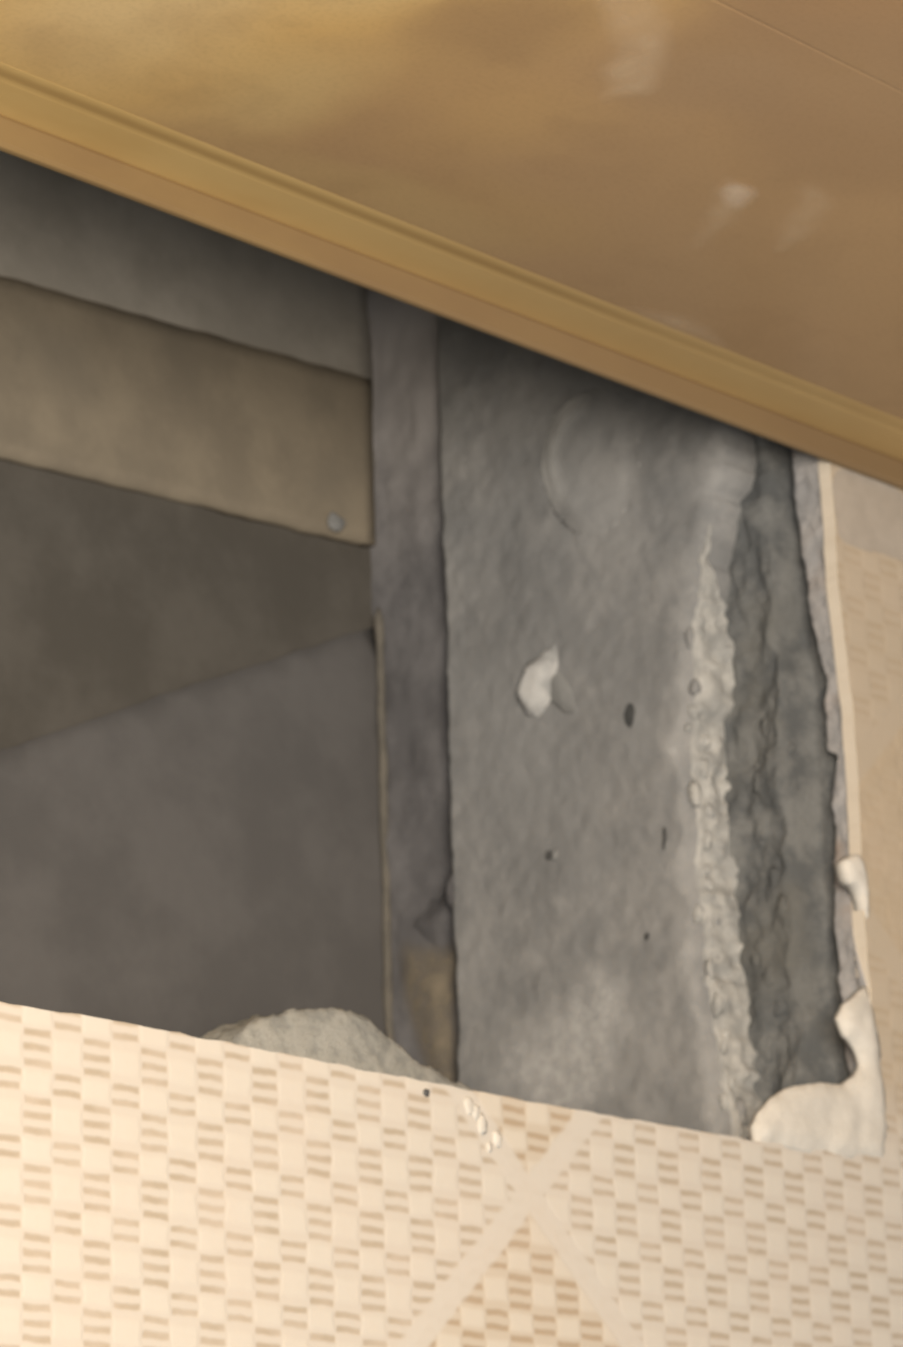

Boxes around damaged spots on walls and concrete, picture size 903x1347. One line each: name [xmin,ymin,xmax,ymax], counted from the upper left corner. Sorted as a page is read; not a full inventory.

peeling [517,642,578,717]
spalling [624,703,635,727]
spalling [684,434,869,1140]
spalling [464,1097,502,1153]